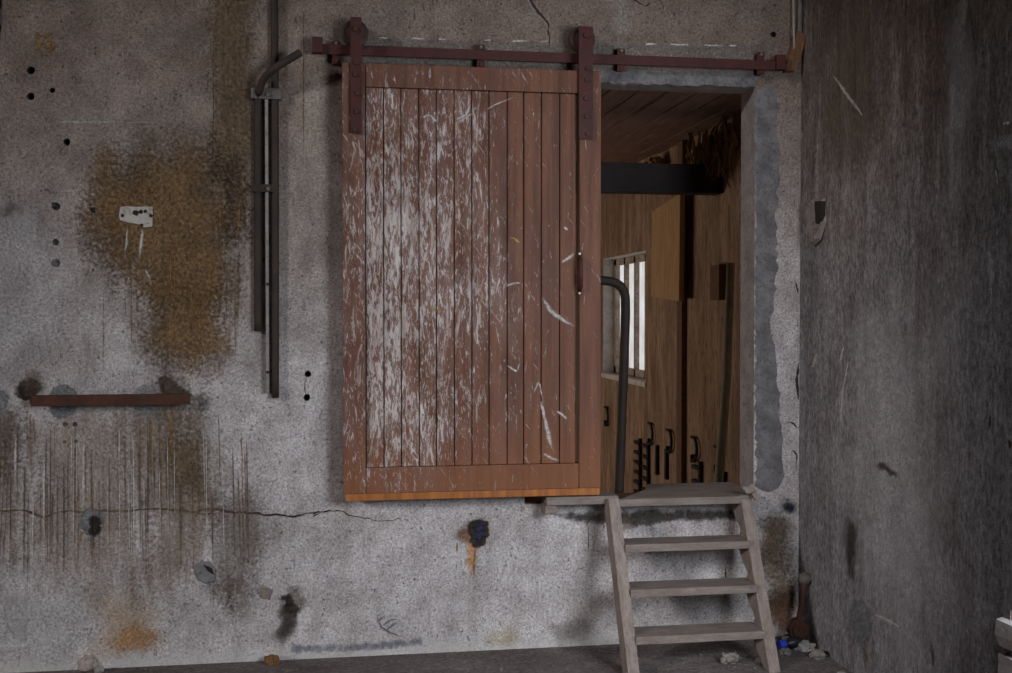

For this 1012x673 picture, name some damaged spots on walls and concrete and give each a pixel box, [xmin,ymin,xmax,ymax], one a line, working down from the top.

crack [528,0,550,49]
rust [83,131,252,378]
crack [0,507,402,523]
rust [456,519,490,569]
flaking render [995,617,1012,673]